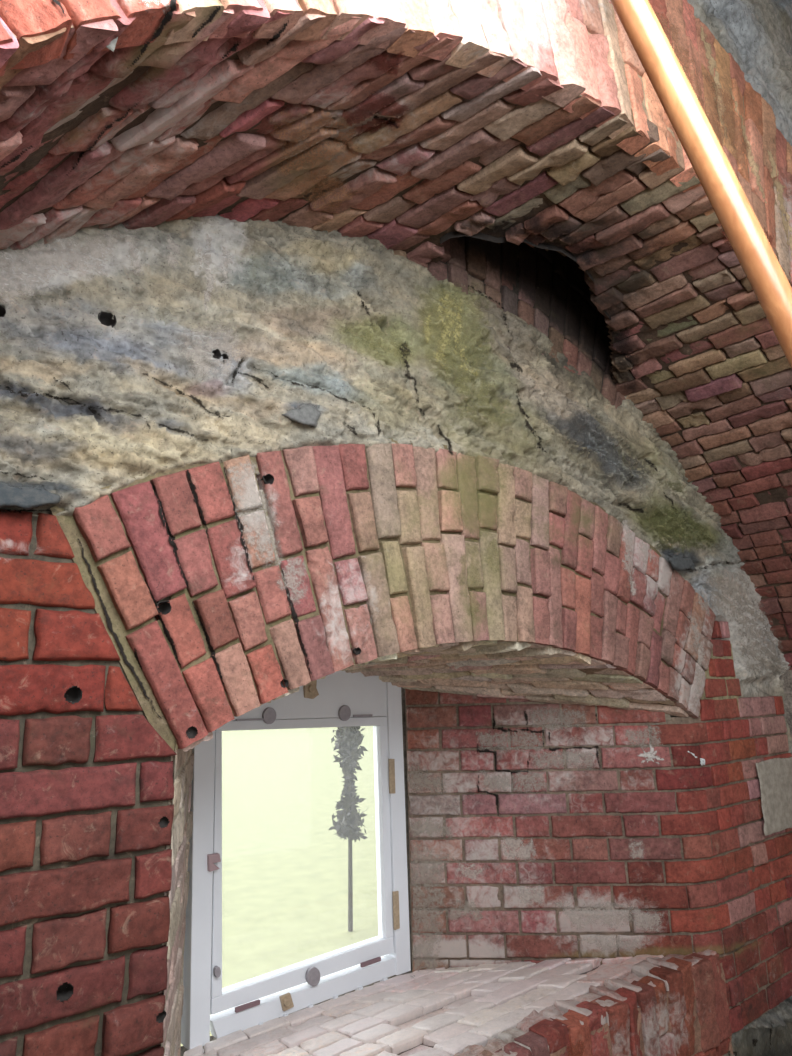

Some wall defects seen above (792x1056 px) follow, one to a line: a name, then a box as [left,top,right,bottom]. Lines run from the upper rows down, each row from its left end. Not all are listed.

crack [0,377,208,441]
crack [143,373,230,419]
crack [399,342,453,456]